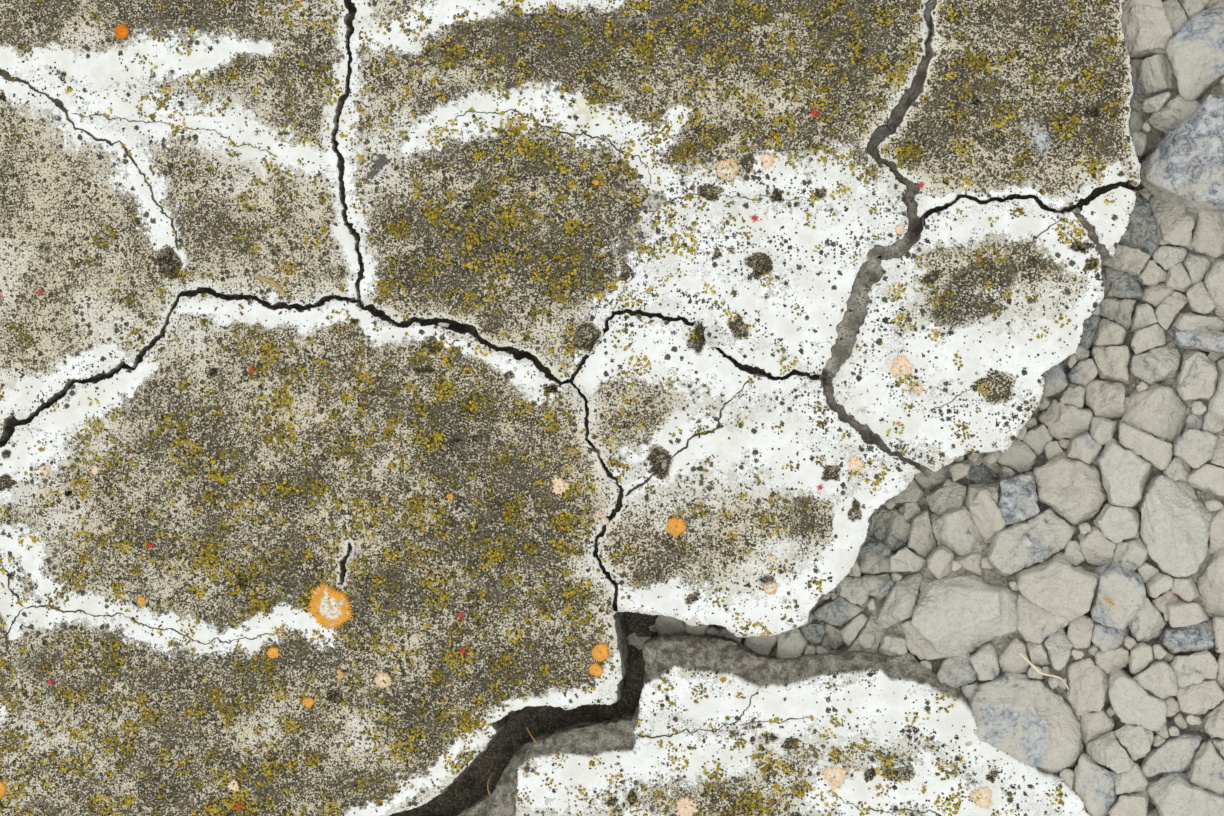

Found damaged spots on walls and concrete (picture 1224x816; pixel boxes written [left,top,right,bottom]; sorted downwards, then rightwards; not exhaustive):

spalling [220,3,613,401]
crack [451,109,807,247]
crack [671,0,1146,478]
spalling [919,255,1041,329]
spalling [0,244,199,492]
crack [0,0,705,816]
spalling [971,370,1016,405]
spalling [997,343,1103,473]
spalling [455,418,1000,816]
spalling [1063,525,1159,583]
crack [636,688,808,739]
crack [837,796,941,816]